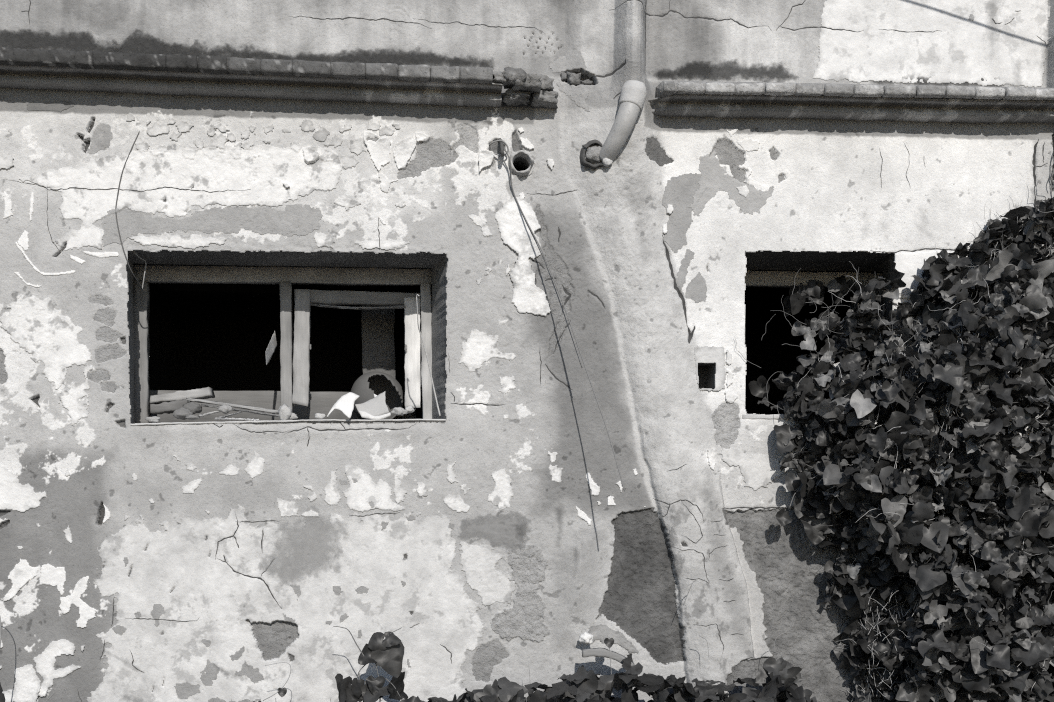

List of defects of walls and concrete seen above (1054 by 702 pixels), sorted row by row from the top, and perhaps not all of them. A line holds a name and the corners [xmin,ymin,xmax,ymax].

crack [288,16,541,31]
crack [595,0,940,98]
peeling [813,0,1051,87]
peeling [19,113,554,257]
spalling [645,137,674,166]
peeling [662,129,785,303]
peeling [468,192,574,356]
peeling [0,295,127,426]
peeling [459,328,516,372]
peeling [219,451,265,478]
peeling [548,451,562,483]
peeling [0,455,550,702]